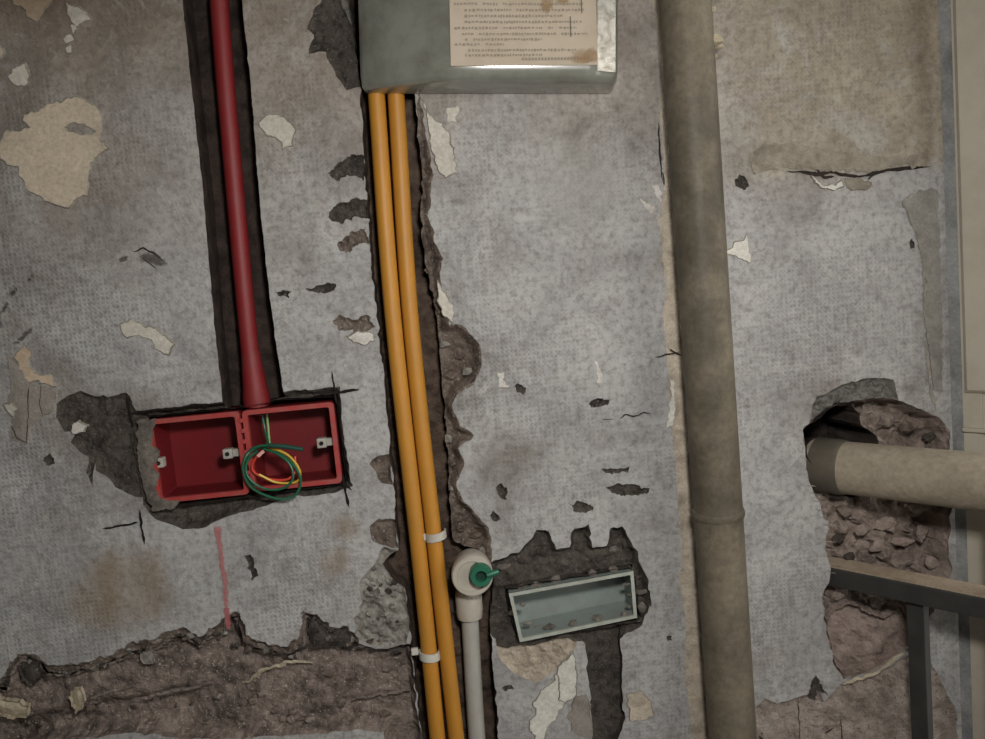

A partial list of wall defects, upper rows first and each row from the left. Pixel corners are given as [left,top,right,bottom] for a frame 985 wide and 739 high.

peeling [11,0,53,23]
peeling [64,1,94,53]
flaking render [307,0,361,90]
peeling [0,96,110,209]
peeling [258,114,297,149]
crack [750,142,930,191]
flaking render [56,387,353,529]
flaking render [416,94,656,739]
flaking render [806,485,952,579]
flaking render [0,519,422,739]
flaking render [755,585,912,739]
flaking render [931,663,958,739]